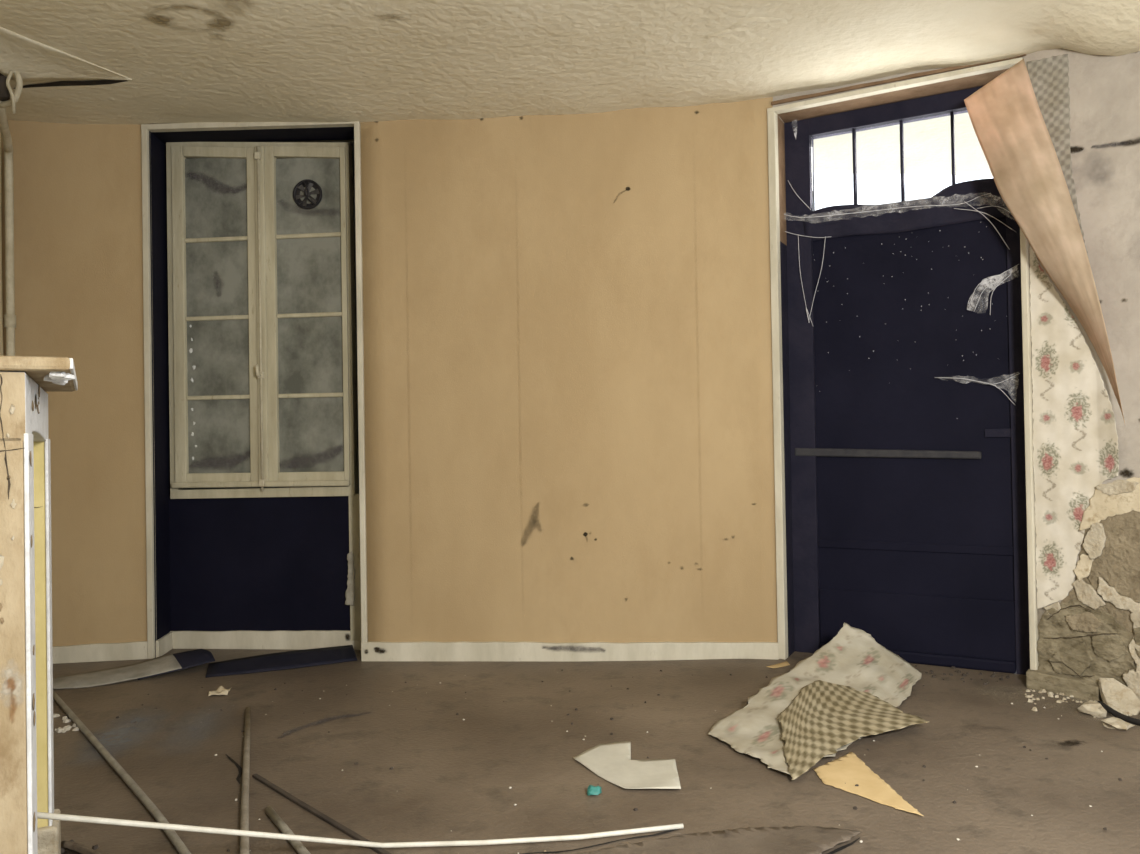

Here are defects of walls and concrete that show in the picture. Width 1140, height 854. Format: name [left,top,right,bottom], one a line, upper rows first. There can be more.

leakage [148,6,231,36]
crack [1070,138,1140,153]
crack [0,374,23,499]
spalling [1037,469,1140,700]